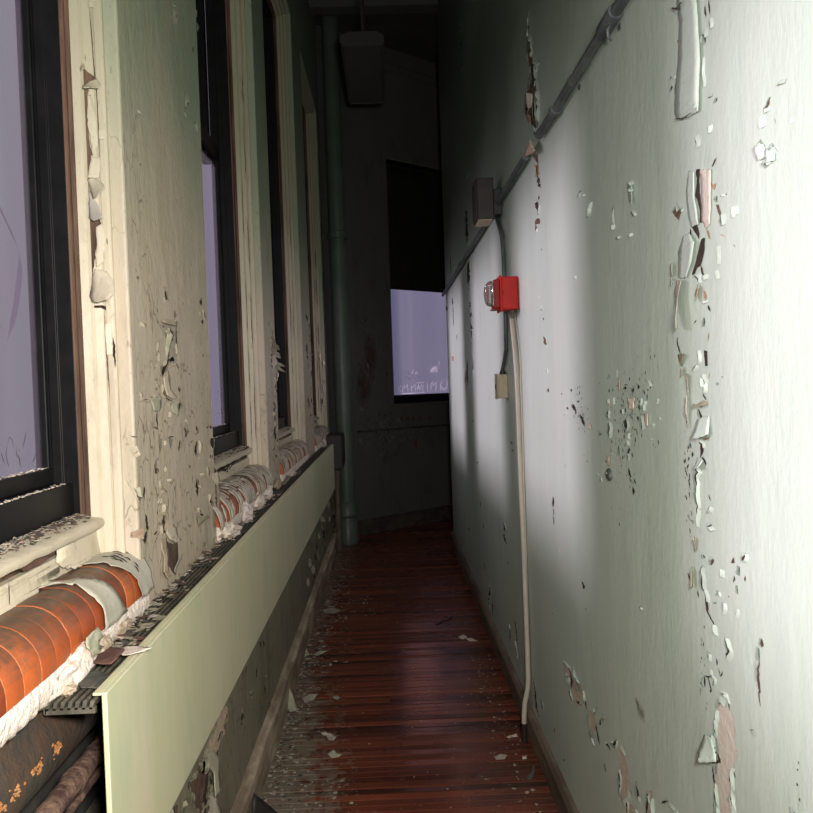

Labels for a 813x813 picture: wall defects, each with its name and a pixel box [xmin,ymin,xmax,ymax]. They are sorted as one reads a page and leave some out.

peeling [670,0,717,122]
peeling [80,0,115,309]
peeling [105,323,116,390]
peeling [156,310,182,418]
peeling [267,313,285,393]
peeling [196,403,308,530]
peeling [561,369,662,495]
peeling [143,479,184,579]
corrosion [0,757,43,813]
peeling [183,703,229,813]
peeling [562,660,655,813]
peeling [715,690,737,813]